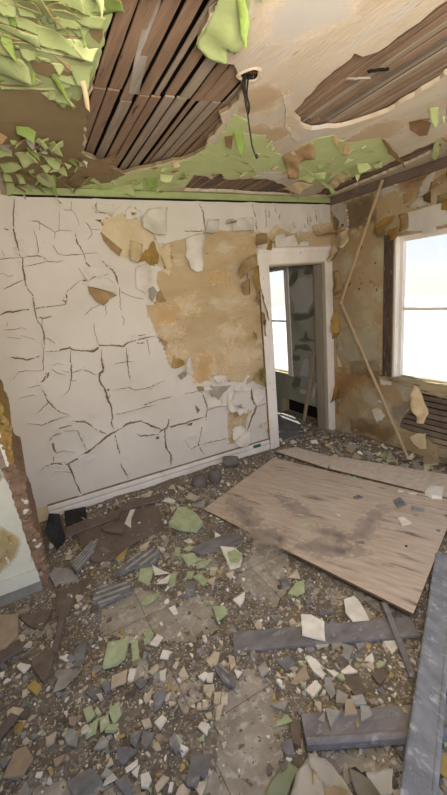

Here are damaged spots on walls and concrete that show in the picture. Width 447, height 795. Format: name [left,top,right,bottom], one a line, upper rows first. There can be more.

crack [1,199,227,493]
flaking render [0,0,447,448]
crack [247,389,266,431]